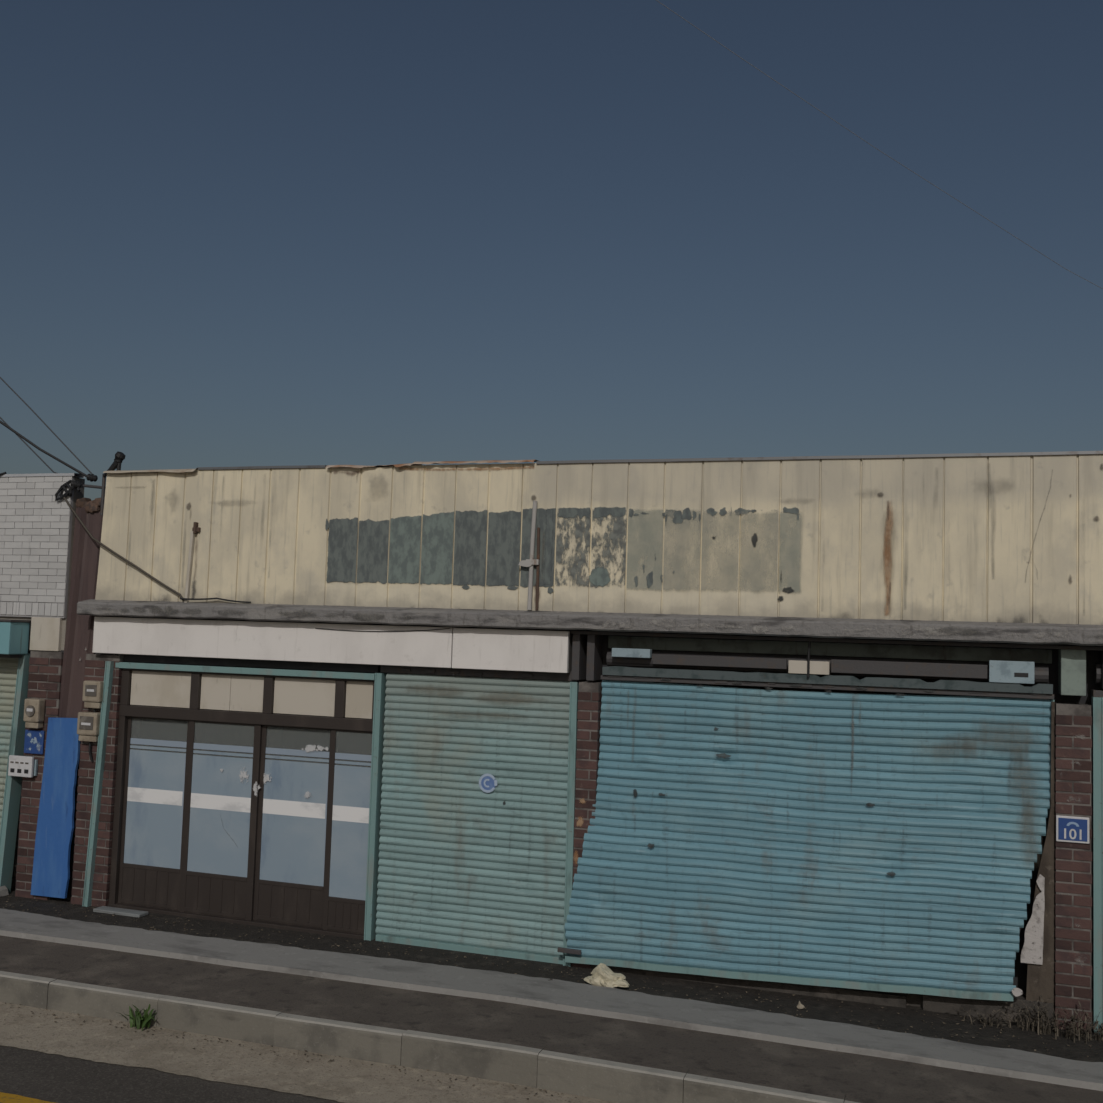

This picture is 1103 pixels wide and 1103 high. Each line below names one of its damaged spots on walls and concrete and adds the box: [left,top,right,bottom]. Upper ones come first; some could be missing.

peeling [325,507,801,601]
corrosion [884,510,892,615]
peeling [1020,874,1045,965]